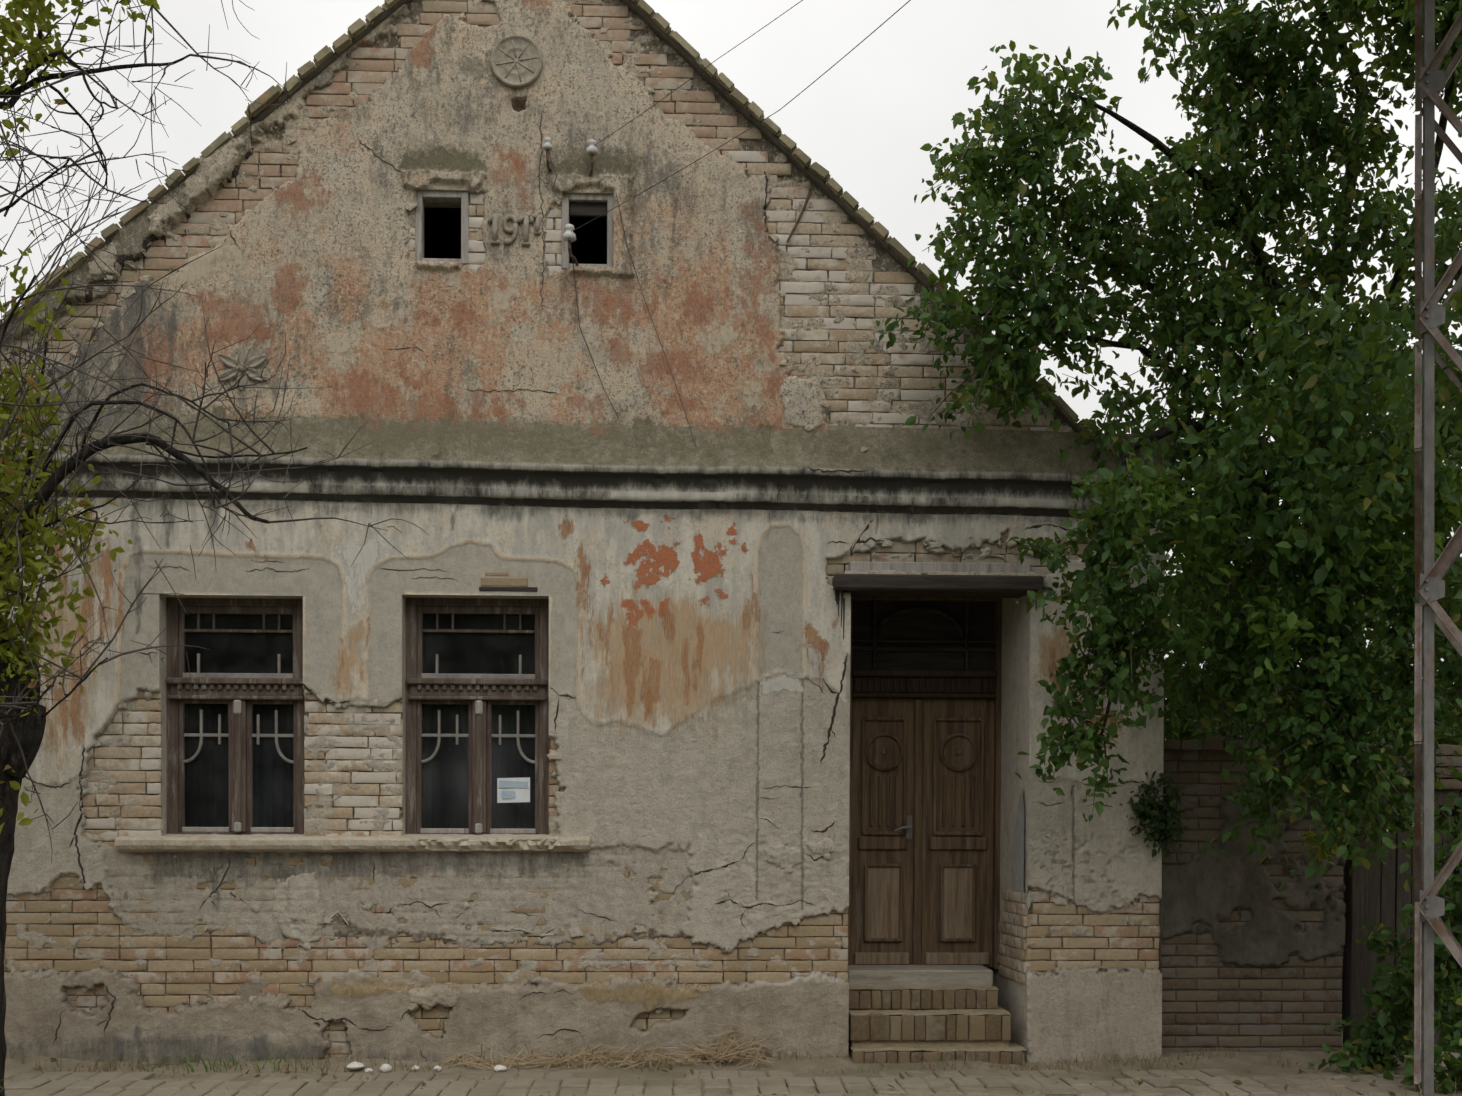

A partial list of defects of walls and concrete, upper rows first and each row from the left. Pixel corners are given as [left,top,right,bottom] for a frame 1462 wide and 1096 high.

spalling [569,0,1072,432]
peeling [621,514,748,628]
spalling [826,523,1098,593]
spalling [4,689,848,1015]
crack [672,656,847,926]
spalling [997,790,1160,984]
spalling [408,1003,452,1037]
spalling [632,1009,685,1030]